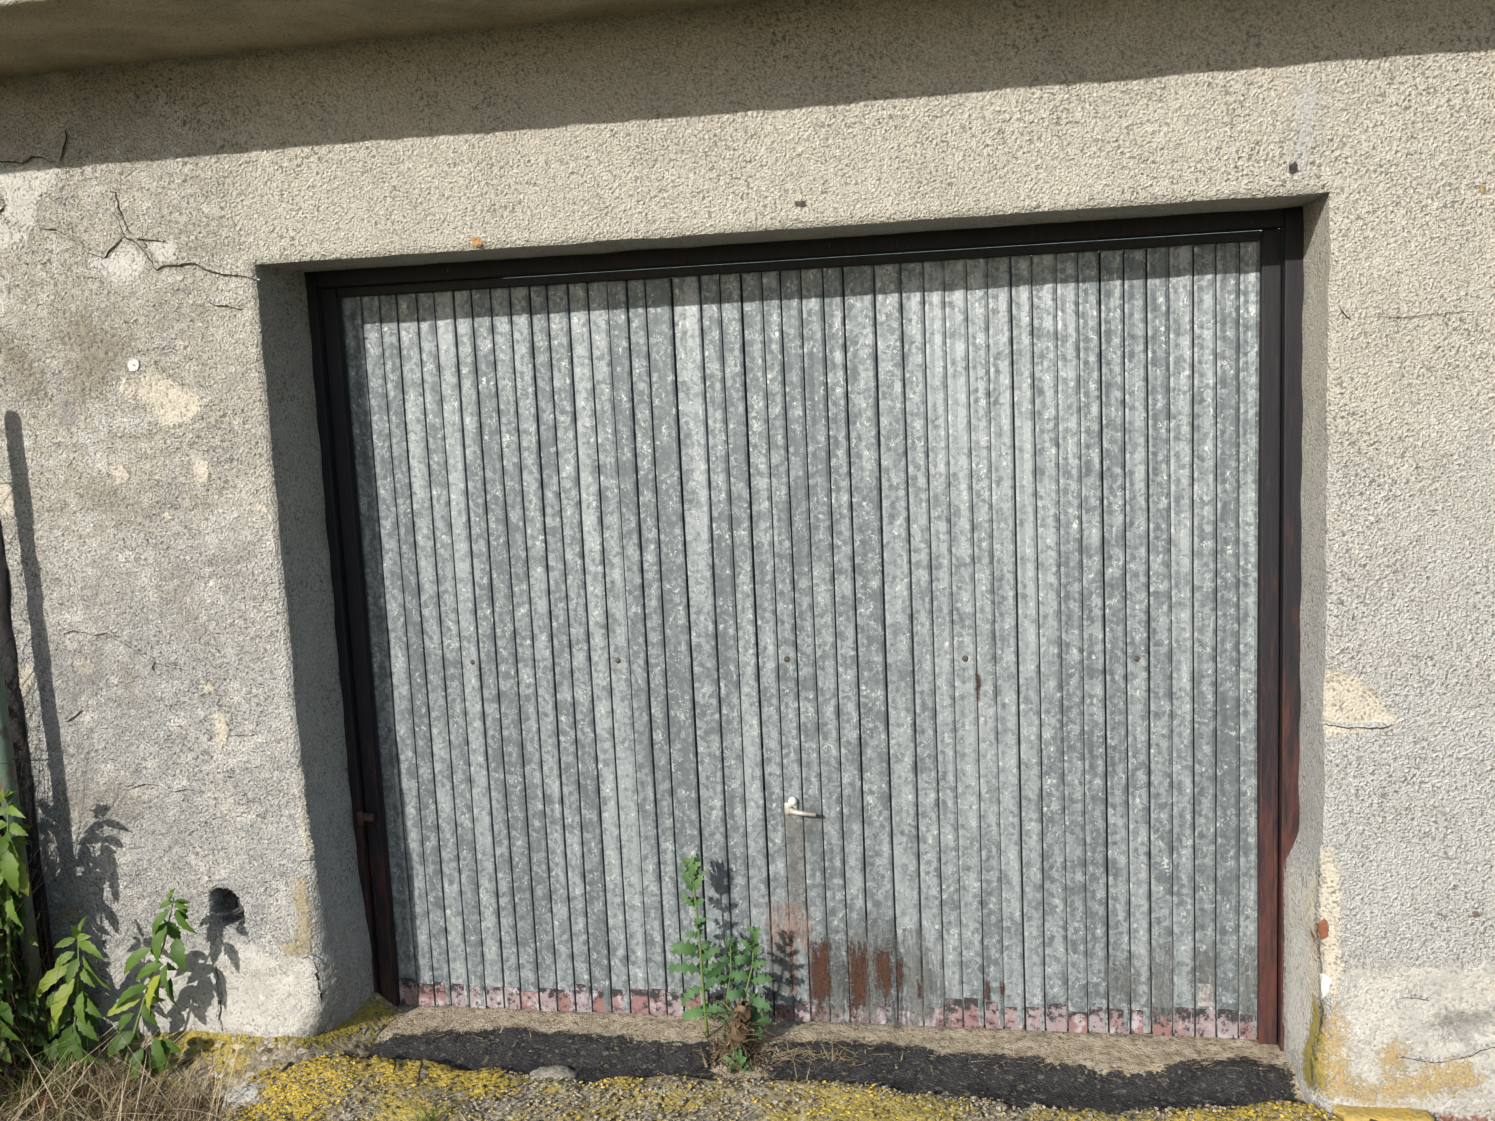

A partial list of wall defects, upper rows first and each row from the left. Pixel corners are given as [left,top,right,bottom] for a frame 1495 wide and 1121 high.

crack [0,128,67,212]
crack [37,190,260,309]
corrosion [772,908,922,1019]
peeling [1121,846,1495,1121]
spalling [219,1059,764,1121]
spalling [793,1080,1067,1121]
crack [1397,1041,1495,1063]